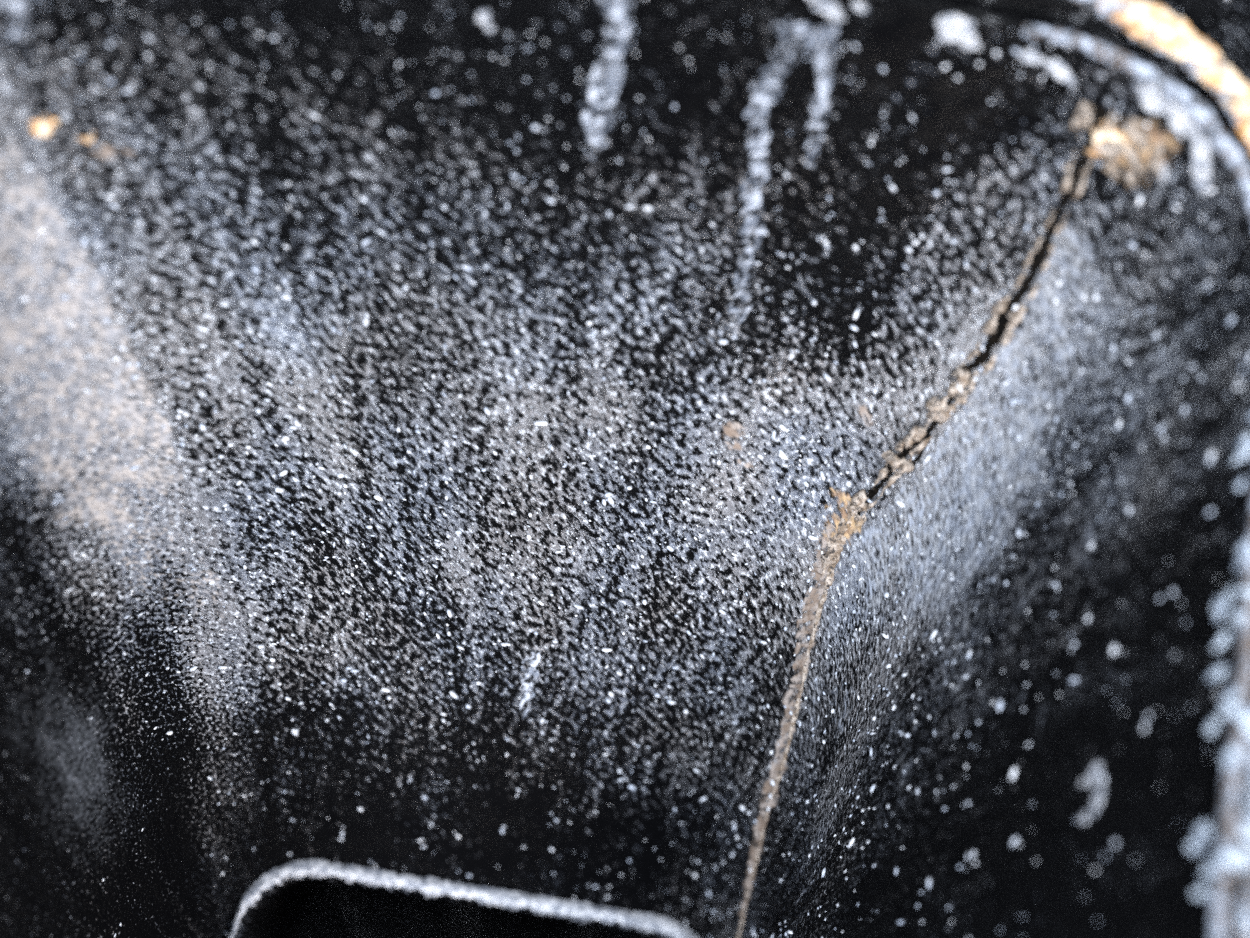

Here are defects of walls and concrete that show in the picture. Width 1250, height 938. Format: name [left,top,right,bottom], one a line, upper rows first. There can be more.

damp [579,0,634,160]
damp [676,19,838,369]
crack [846,102,1115,535]
corrosion [1112,0,1250,144]